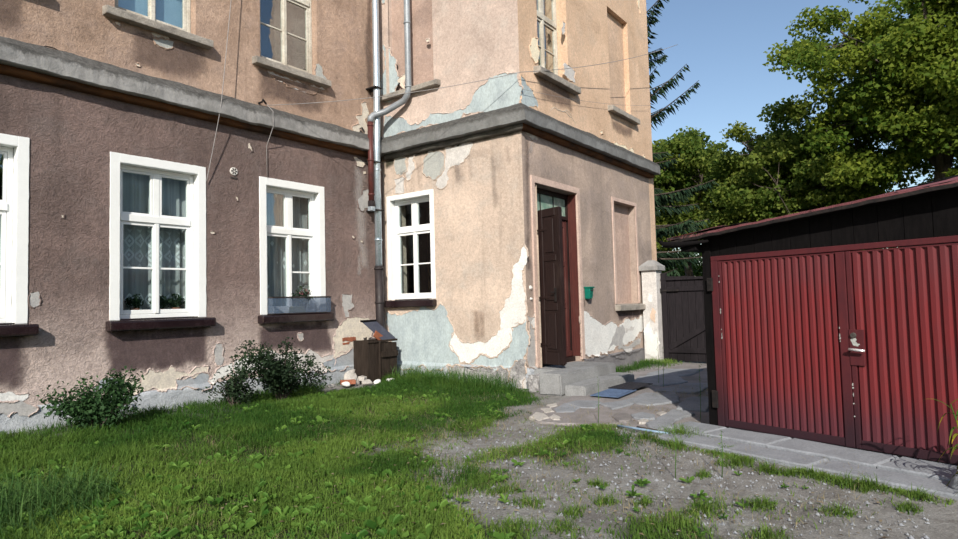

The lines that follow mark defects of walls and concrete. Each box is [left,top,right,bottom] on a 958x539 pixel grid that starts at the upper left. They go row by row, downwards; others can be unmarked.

peeling [529,37,540,65]
peeling [393,142,473,195]
leakage [0,336,21,387]
leakage [107,327,206,372]
peeling [94,293,373,396]
peeling [385,243,538,389]
peeling [579,293,660,359]
peeling [0,391,40,418]